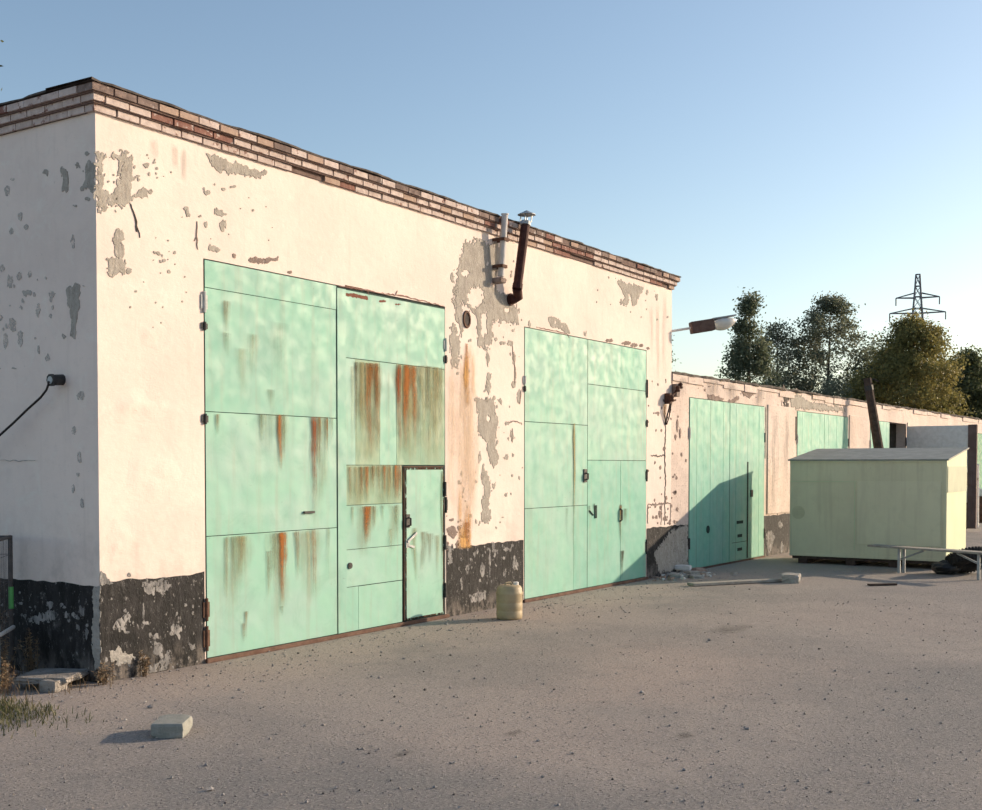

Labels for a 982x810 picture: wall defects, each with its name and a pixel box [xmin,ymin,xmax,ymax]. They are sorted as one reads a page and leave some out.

peeling [42,149,172,213]
peeling [203,153,267,196]
crack [130,204,140,238]
peeling [106,228,132,278]
peeling [608,276,658,318]
rust [313,417,328,470]
rust [355,363,379,409]
rust [397,365,439,427]
peeling [446,237,531,603]
rust [460,513,471,547]
rust [279,532,314,581]
peeling [0,571,200,673]